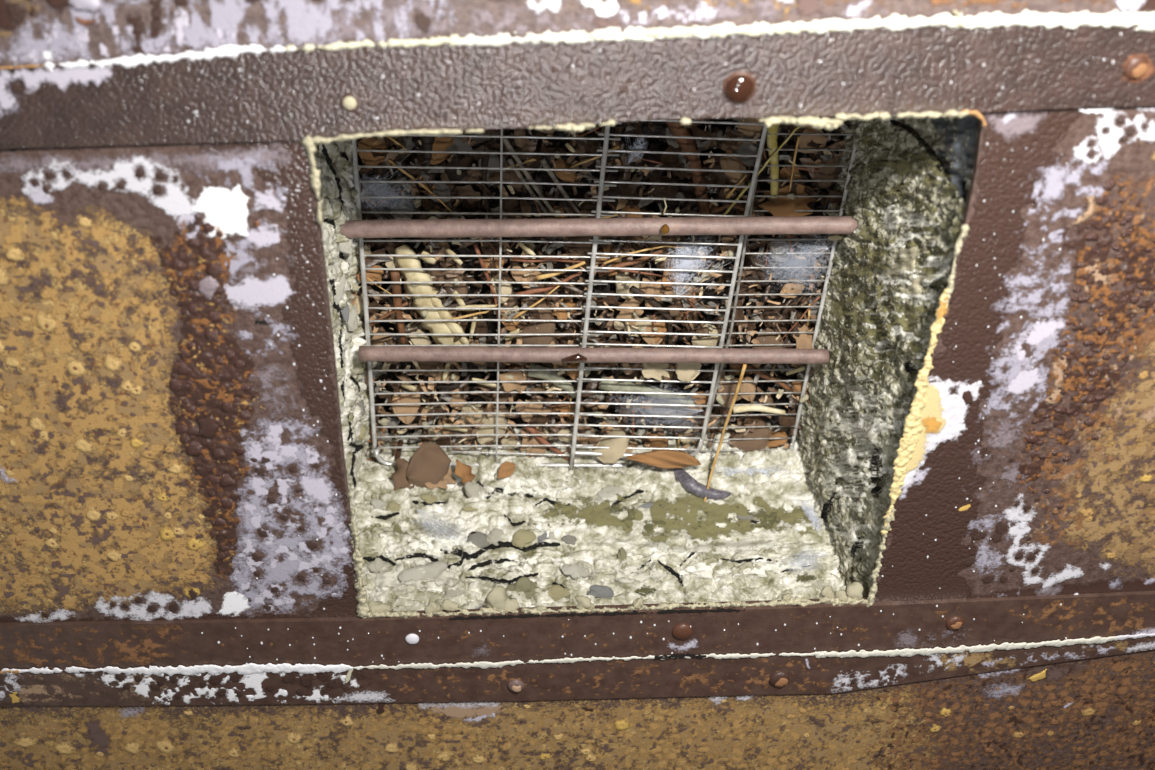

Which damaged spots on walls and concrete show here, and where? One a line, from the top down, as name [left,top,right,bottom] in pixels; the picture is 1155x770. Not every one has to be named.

corrosion [128,0,161,55]
damp [0,0,794,116]
damp [0,143,350,623]
corrosion [0,142,358,667]
spalling [776,376,915,556]
spalling [860,204,953,369]
corrosion [875,108,1155,651]
damp [968,107,1155,596]
spalling [364,533,478,591]
spalling [491,535,803,584]
damp [101,669,394,717]
corrosion [0,644,1155,770]